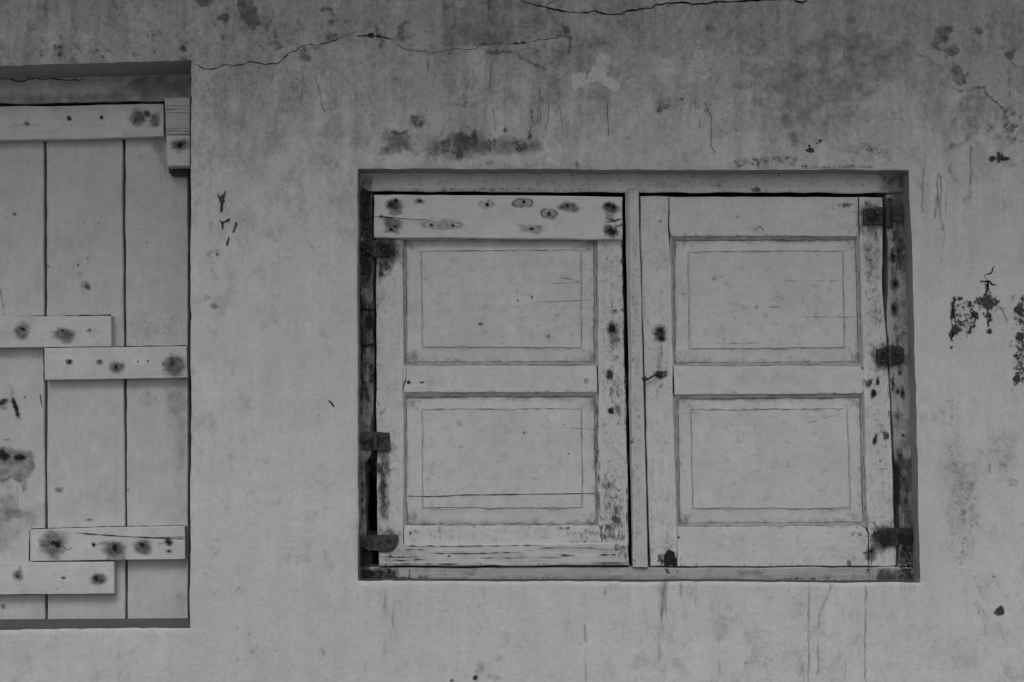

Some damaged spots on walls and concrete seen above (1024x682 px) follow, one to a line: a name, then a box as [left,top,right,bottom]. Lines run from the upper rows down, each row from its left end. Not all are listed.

crack [181,0,761,70]
peeling [571,54,620,92]
damp [437,129,532,162]
flaking render [948,267,1000,349]
flaking render [1013,295,1024,386]